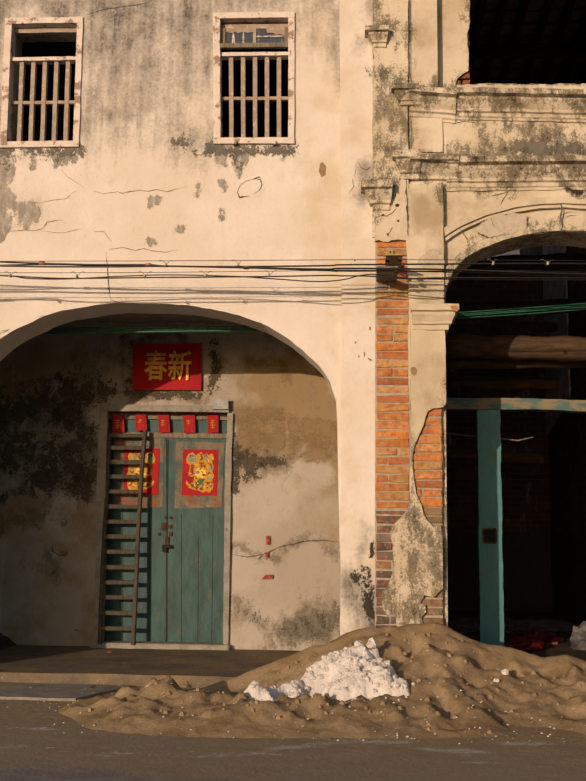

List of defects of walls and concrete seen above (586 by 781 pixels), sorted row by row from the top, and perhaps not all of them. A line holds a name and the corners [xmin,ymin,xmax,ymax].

crack [16,220,177,304]
peeling [476,212,527,238]
leakage [0,355,123,534]
leakage [231,405,337,495]
flaking render [358,233,445,628]
crack [232,540,336,559]
leakage [276,600,340,647]